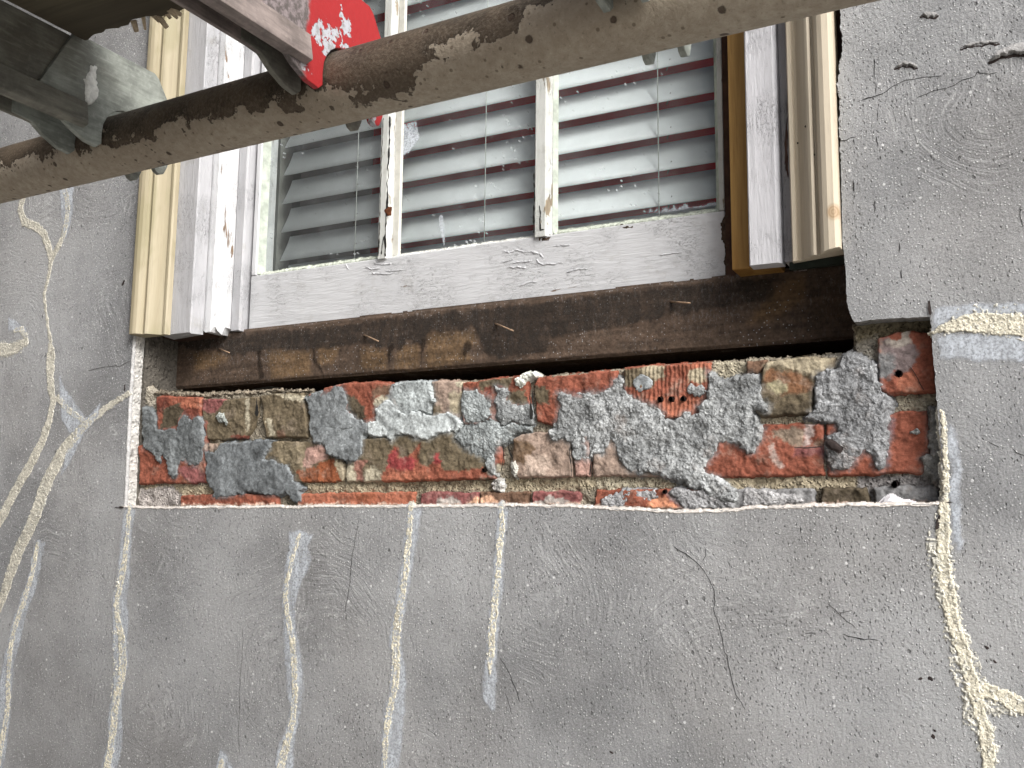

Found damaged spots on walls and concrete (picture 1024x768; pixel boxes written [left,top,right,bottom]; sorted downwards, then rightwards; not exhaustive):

crack [840,54,997,159]
flaking render [138,321,939,510]
crack [676,548,745,709]